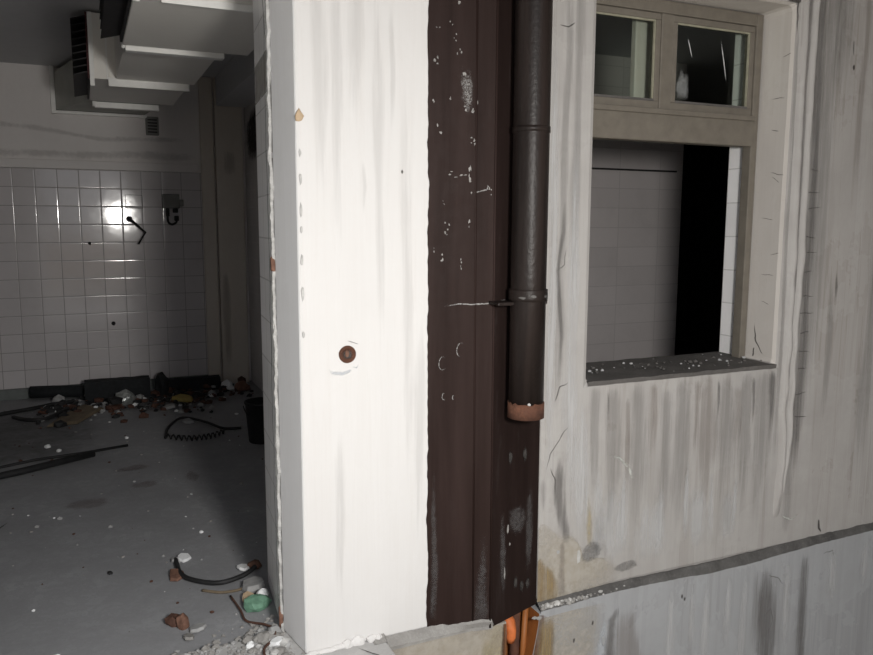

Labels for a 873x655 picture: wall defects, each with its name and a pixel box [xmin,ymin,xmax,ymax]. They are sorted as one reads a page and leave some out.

damp [795,1,824,291]
rust [339,346,356,363]
damp [793,302,806,436]
damp [504,472,607,602]